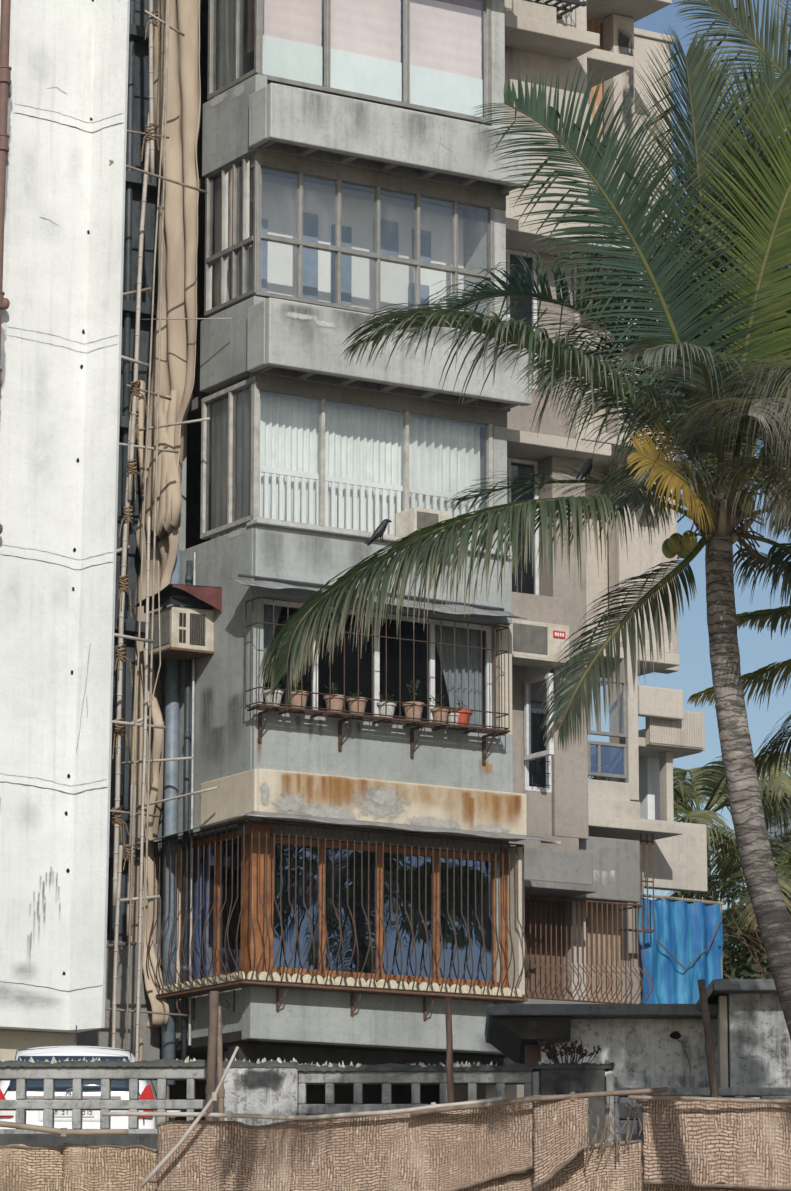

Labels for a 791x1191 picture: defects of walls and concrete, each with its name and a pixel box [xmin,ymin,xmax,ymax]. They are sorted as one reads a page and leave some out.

corrosion [200,768,527,842]